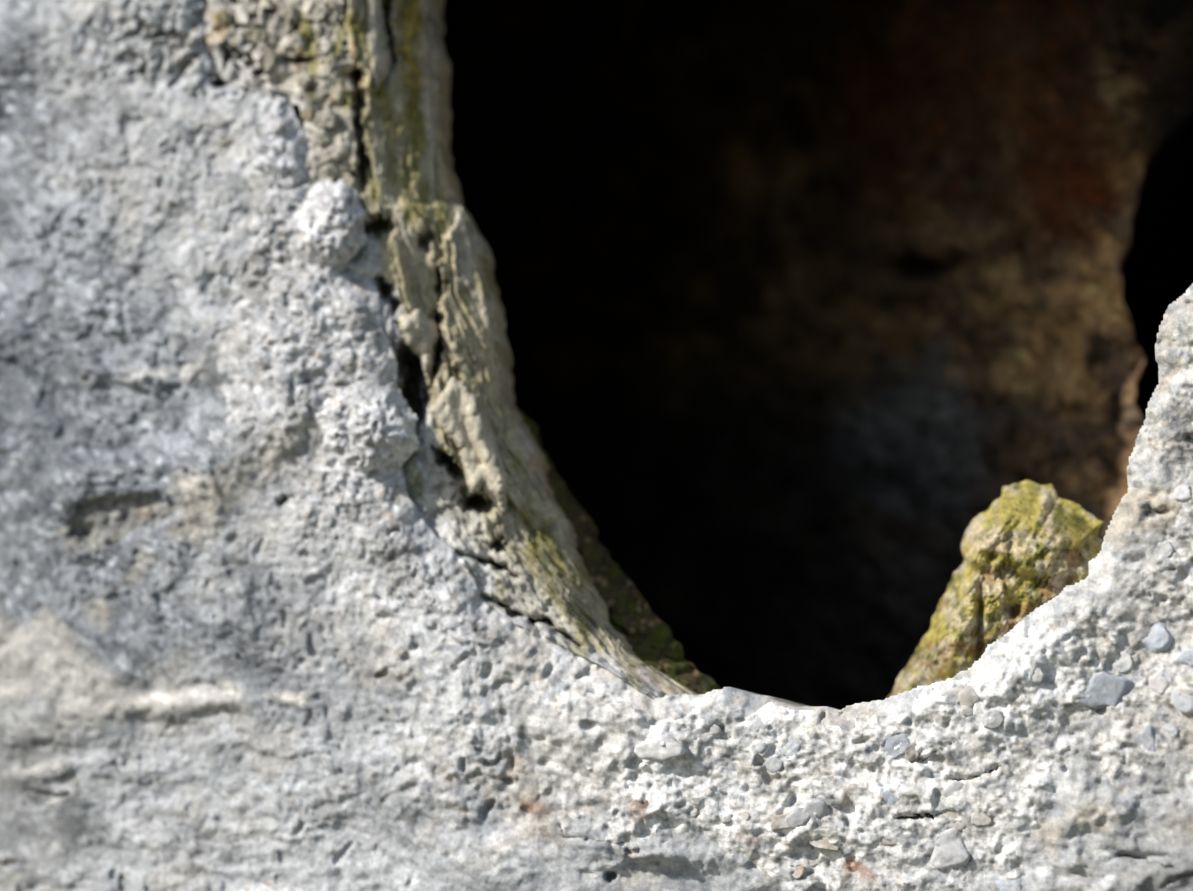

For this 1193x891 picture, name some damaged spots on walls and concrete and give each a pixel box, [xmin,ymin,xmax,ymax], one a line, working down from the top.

spalling [215,8,280,73]
spalling [282,0,333,57]
peeling [367,0,389,91]
spalling [296,71,347,165]
spalling [208,156,515,655]
spalling [523,312,1193,891]
crack [1118,855,1193,891]